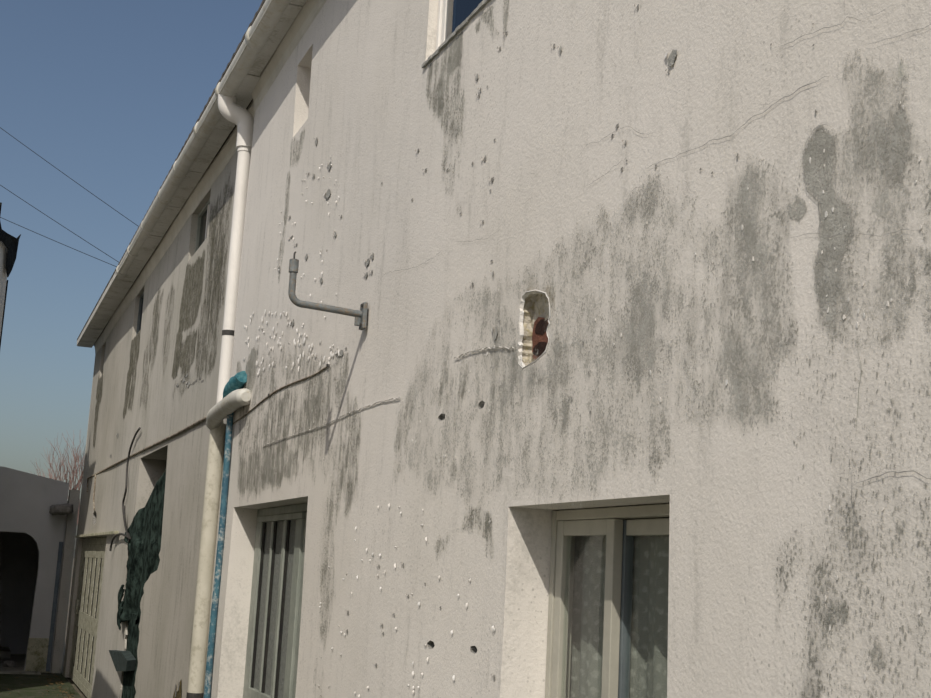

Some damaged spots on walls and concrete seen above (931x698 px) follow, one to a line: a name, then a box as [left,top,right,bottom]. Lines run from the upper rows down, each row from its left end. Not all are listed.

water stain [426,31,465,188]
water stain [476,0,509,35]
crack [625,74,844,202]
water stain [123,176,233,418]
water stain [237,347,361,641]
peeling [395,49,931,698]